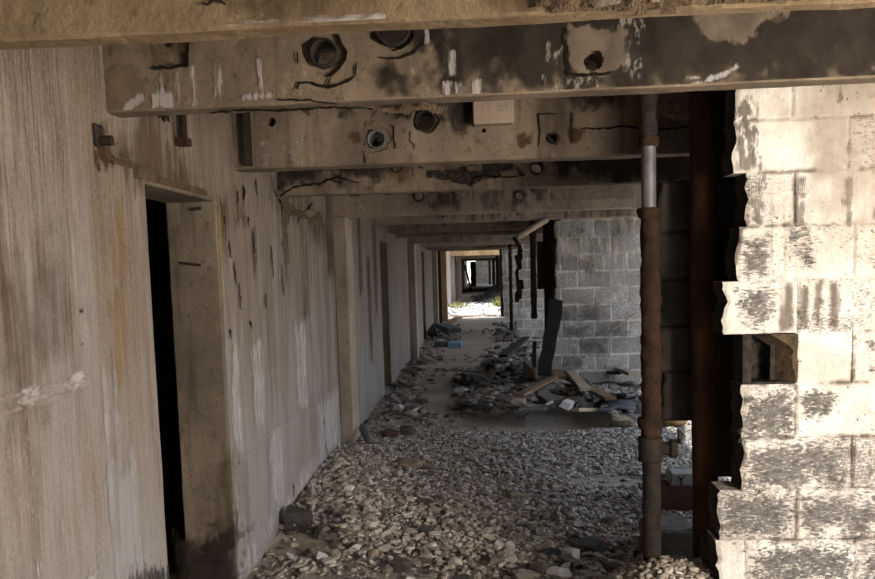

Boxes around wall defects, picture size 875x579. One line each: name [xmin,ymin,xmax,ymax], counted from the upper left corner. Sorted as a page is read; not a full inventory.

spalling [528,0,798,16]
crack [210,52,373,114]
crack [380,34,425,59]
crack [273,151,366,227]
peeling [427,163,523,186]
peeling [733,89,778,331]
peeling [785,176,817,271]
peeling [721,385,875,579]